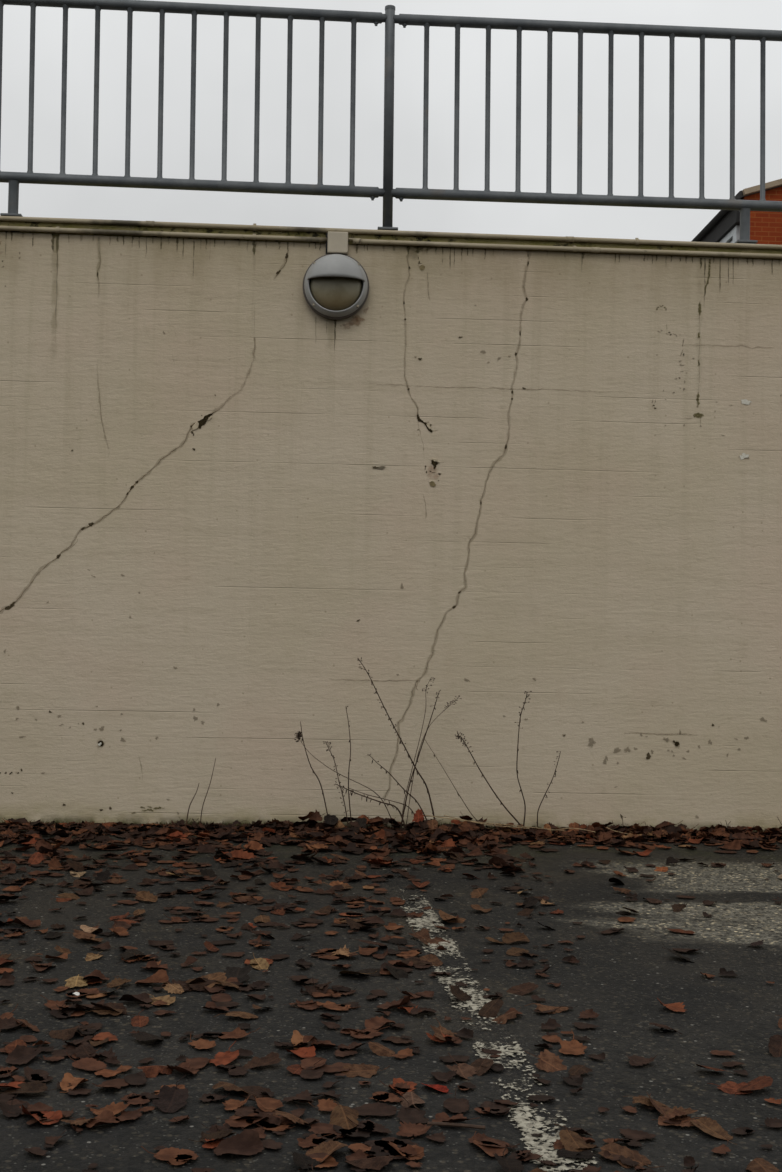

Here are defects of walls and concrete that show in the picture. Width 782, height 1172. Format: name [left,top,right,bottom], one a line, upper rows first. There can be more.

leakage [671,256,754,313]
crack [2,411,216,610]